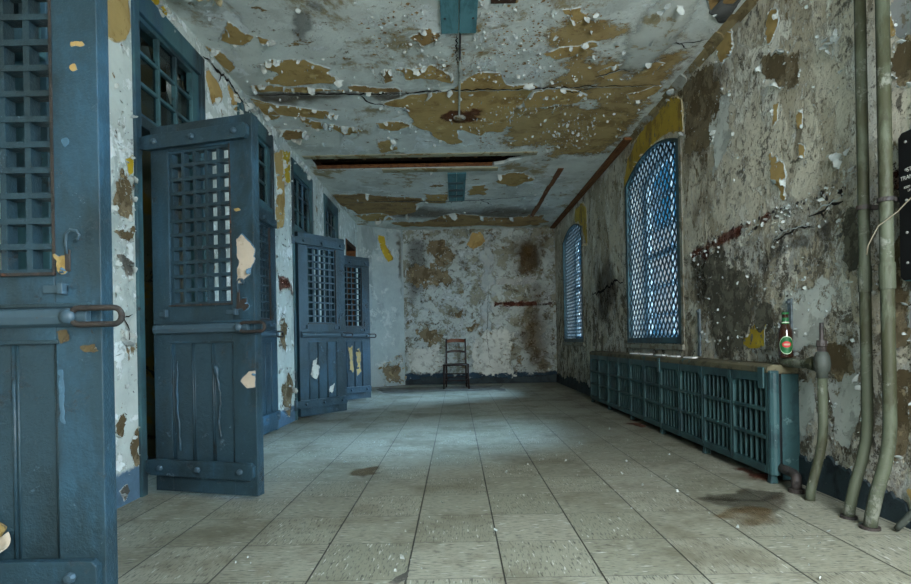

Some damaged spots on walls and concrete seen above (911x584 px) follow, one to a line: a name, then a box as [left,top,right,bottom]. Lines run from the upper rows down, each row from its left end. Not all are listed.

peeling [108,0,131,43]
crack [203,54,659,107]
peeling [754,8,810,91]
peeling [111,83,138,308]
peeling [331,172,562,393]
peeling [184,0,755,353]
water stain [519,245,541,273]
water stain [522,314,540,364]
water stain [694,245,773,360]
rust [689,186,846,259]
water stain [842,207,858,273]
peeling [241,371,256,388]